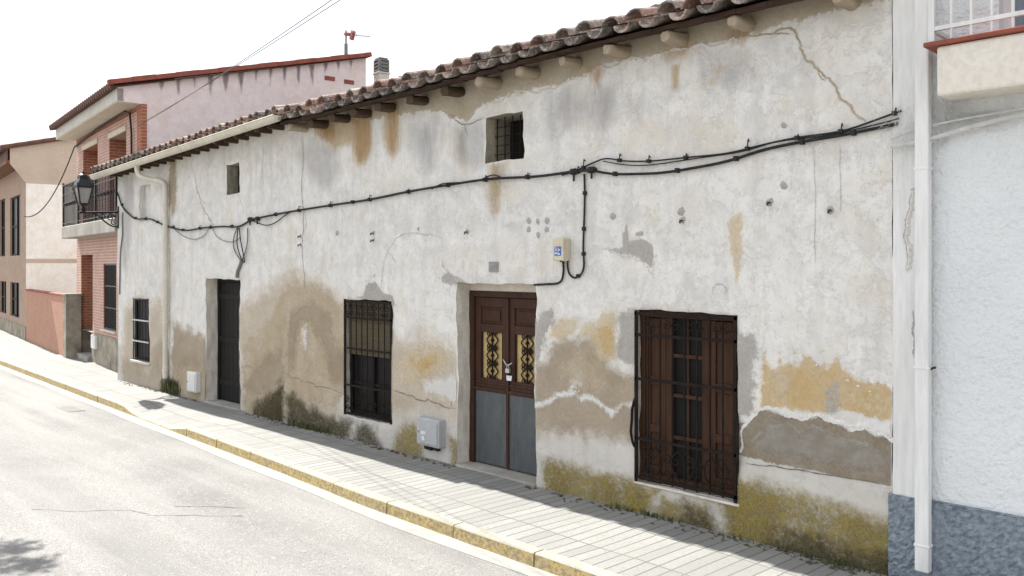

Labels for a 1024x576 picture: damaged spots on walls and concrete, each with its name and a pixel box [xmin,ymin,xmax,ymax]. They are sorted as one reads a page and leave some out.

crack [741,27,866,121]
flaking render [597,224,657,274]
flaking render [361,274,394,305]
leakage [239,280,379,446]
leakage [391,343,456,407]
peeling [535,308,642,364]
flaking render [738,334,893,486]